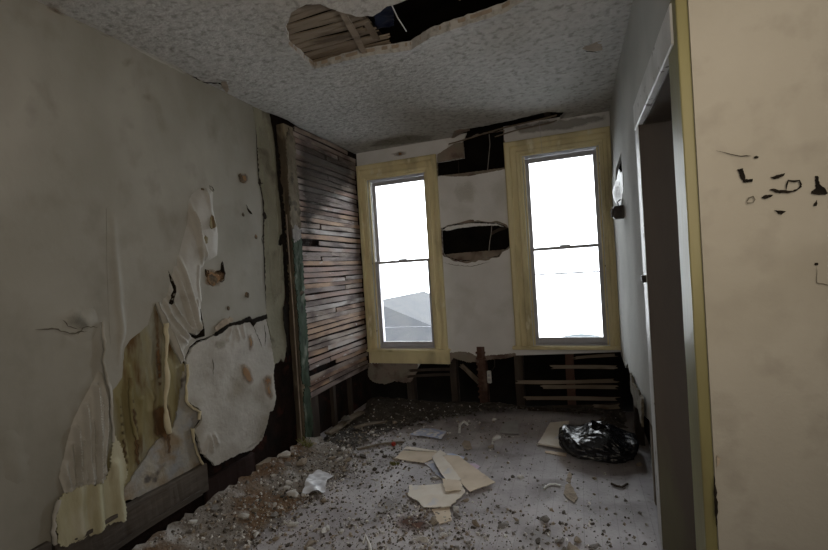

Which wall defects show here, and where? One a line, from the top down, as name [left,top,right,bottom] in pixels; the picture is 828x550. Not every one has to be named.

flaking render [437,128,505,177]
peeling [747,173,802,204]
peeling [811,176,828,206]
flaking render [441,220,510,263]
flaking render [205,261,226,286]
peeling [184,306,276,466]
flaking render [368,363,418,384]